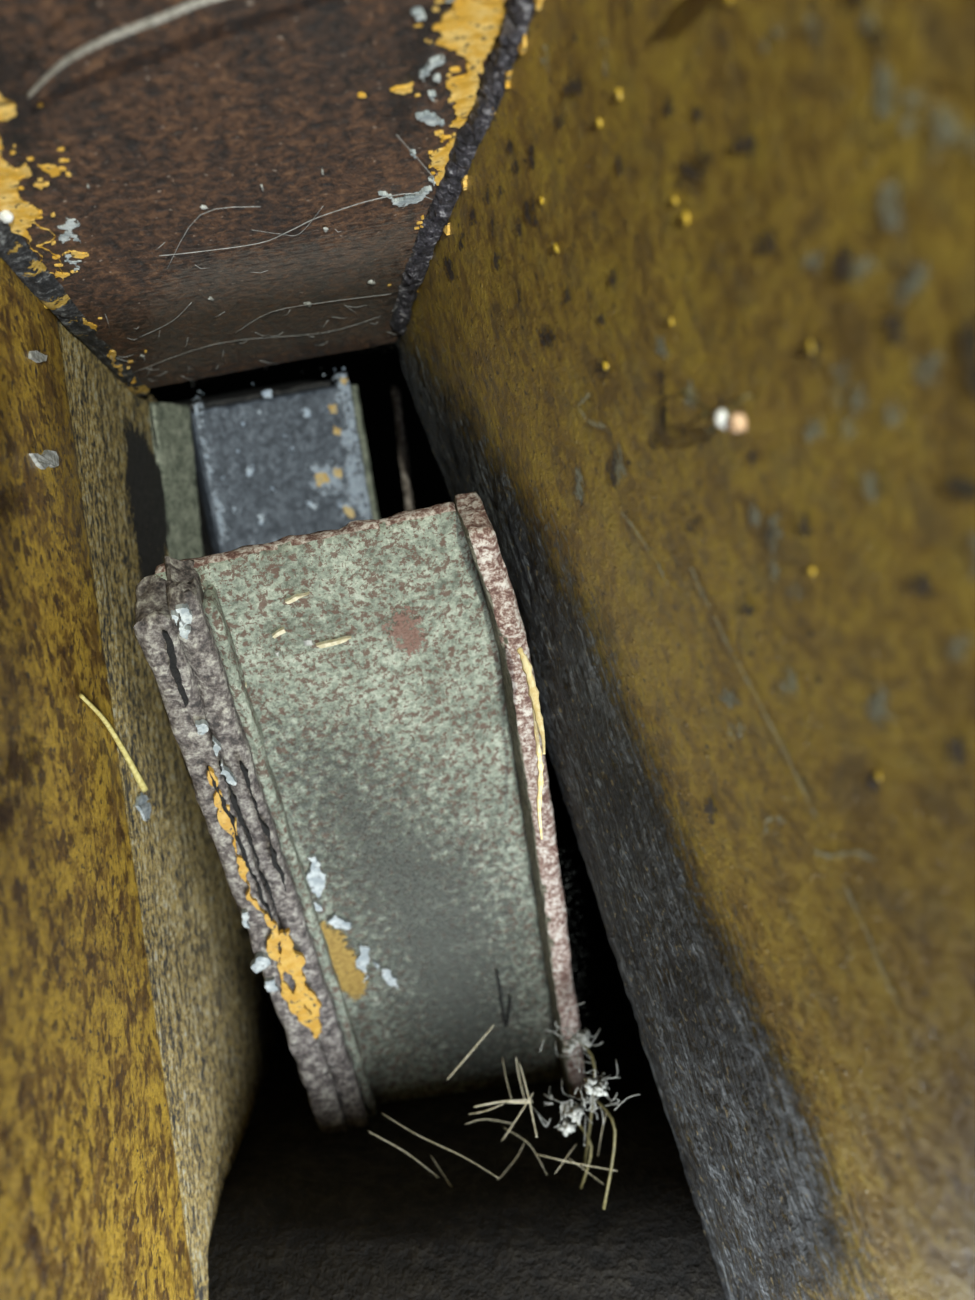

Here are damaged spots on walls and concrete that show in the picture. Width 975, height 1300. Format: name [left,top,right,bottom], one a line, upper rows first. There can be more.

peeling [518,34,527,55]
peeling [0,95,16,121]
peeling [378,0,506,230]
peeling [0,137,89,280]
peeling [443,183,502,280]
peeling [107,350,147,384]
rust [382,606,428,659]
peeling [195,719,322,1039]
peeling [306,854,351,930]
peeling [355,943,398,989]